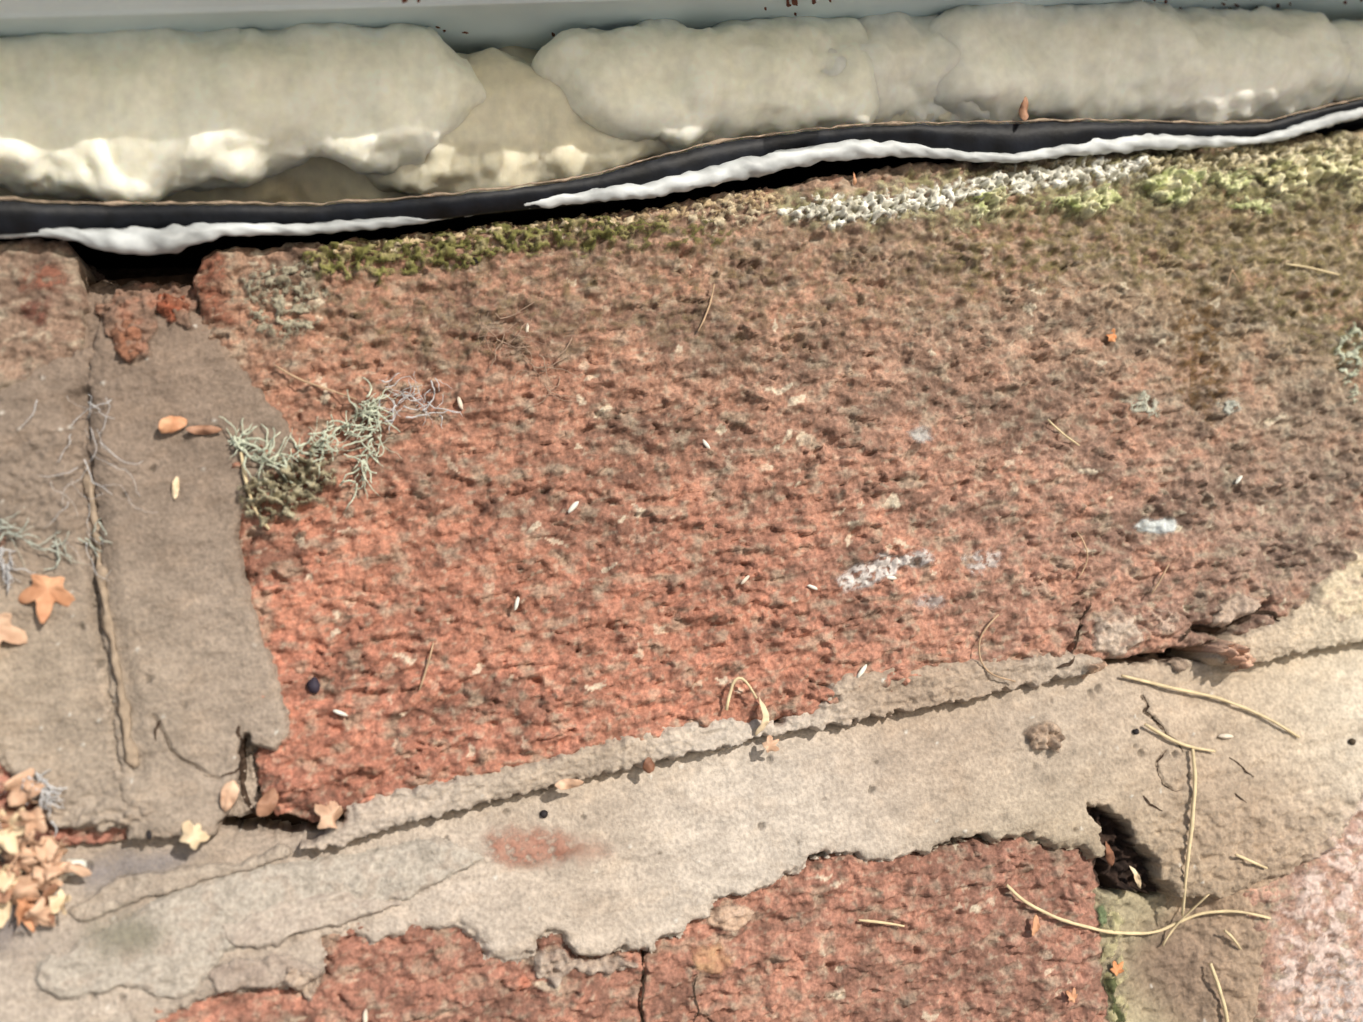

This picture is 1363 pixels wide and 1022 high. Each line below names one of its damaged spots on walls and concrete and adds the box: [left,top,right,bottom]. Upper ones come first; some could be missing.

spalling [21,265,65,326]
spalling [95,252,236,362]
crack [1056,603,1091,668]
peeling [1152,609,1180,632]
spalling [1142,639,1256,673]
spalling [1023,721,1066,753]
spalling [1086,807,1160,895]
peeling [34,835,485,1001]
spalling [503,948,638,991]
crack [640,947,650,1022]
crack [692,976,700,1021]
spalling [691,905,755,974]